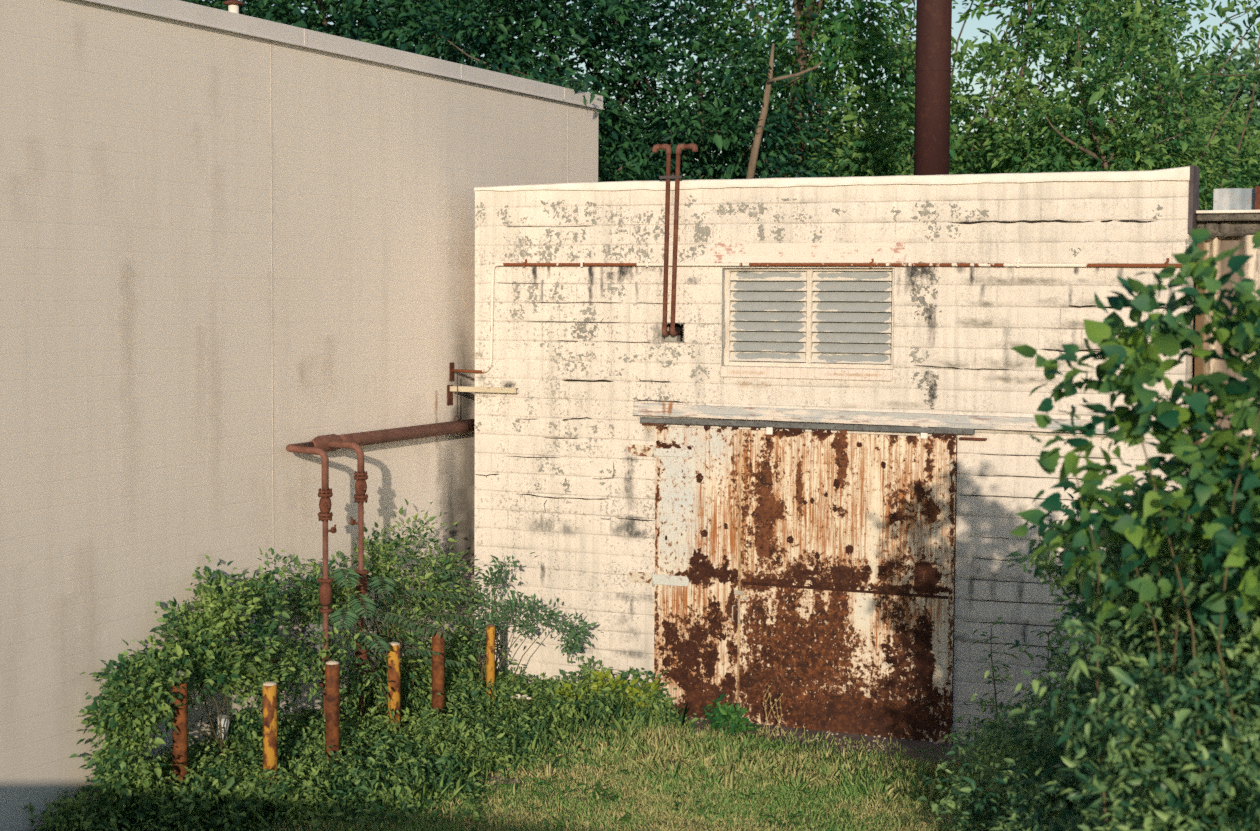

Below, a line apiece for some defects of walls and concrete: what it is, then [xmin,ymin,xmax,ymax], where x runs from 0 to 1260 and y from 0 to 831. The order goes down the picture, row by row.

peeling [475,195,822,263]
peeling [909,261,942,321]
peeling [540,280,625,376]
spalling [615,322,724,384]
peeling [909,345,939,409]
rust [932,433,958,455]
rust [685,423,862,562]
leakage [446,506,473,566]
rust [686,529,738,585]
rust [759,544,894,591]
rust [659,601,777,694]
rust [878,615,942,706]